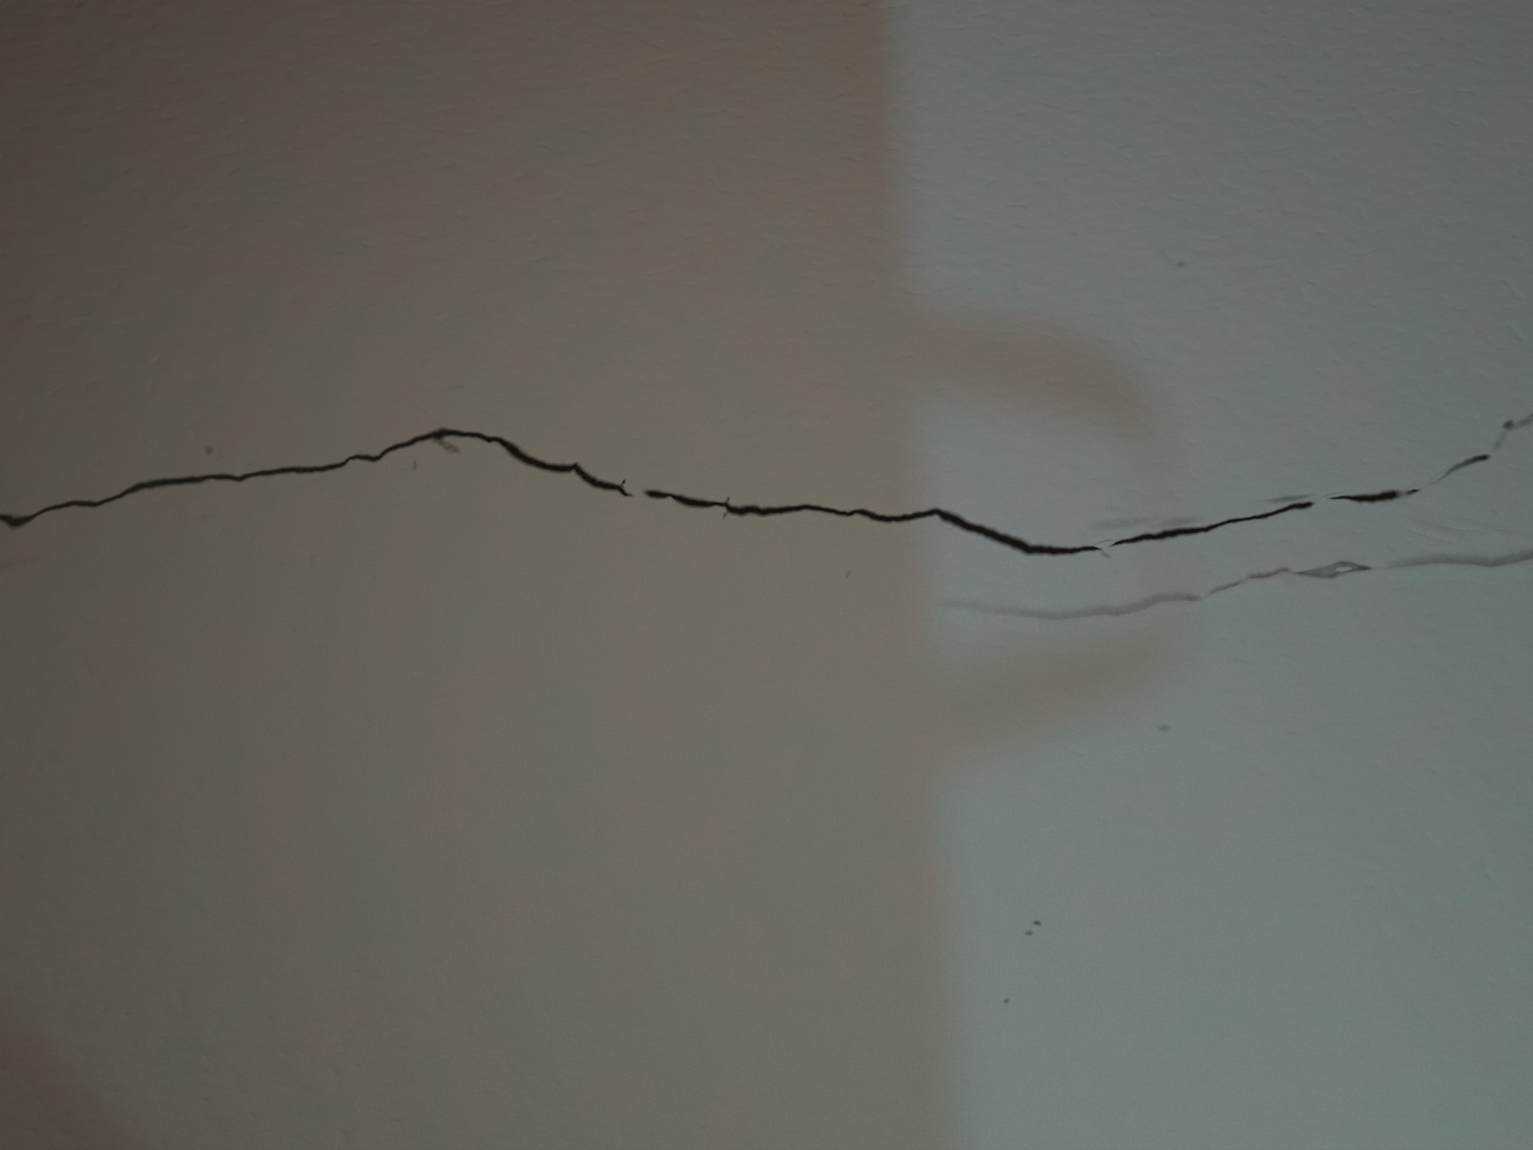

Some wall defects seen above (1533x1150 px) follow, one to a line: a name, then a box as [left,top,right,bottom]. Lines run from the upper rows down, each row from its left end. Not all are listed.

crack [0,429,1488,555]